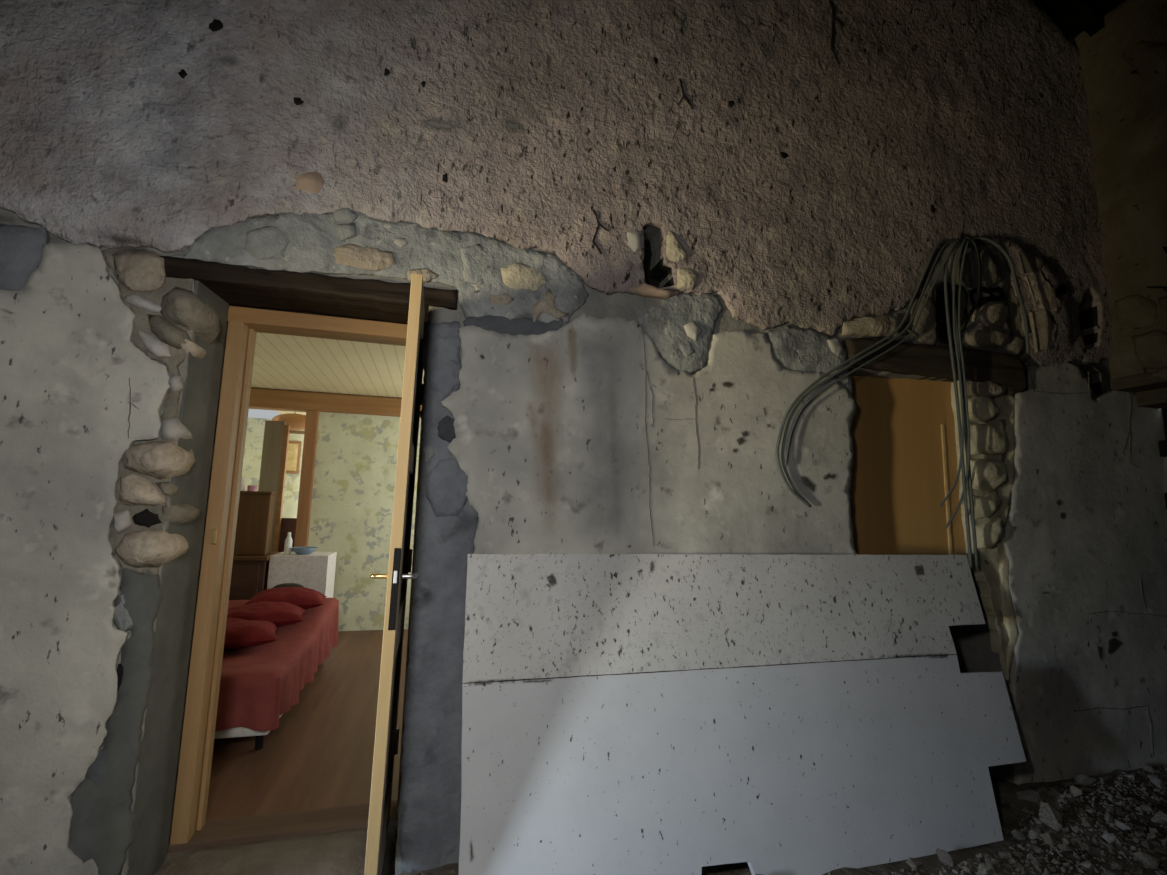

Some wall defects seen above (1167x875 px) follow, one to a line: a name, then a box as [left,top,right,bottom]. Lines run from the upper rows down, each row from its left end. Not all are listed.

crack [829,0,843,65]
spalling [627,225,698,299]
spalling [907,236,1030,363]
peeling [172,208,589,875]